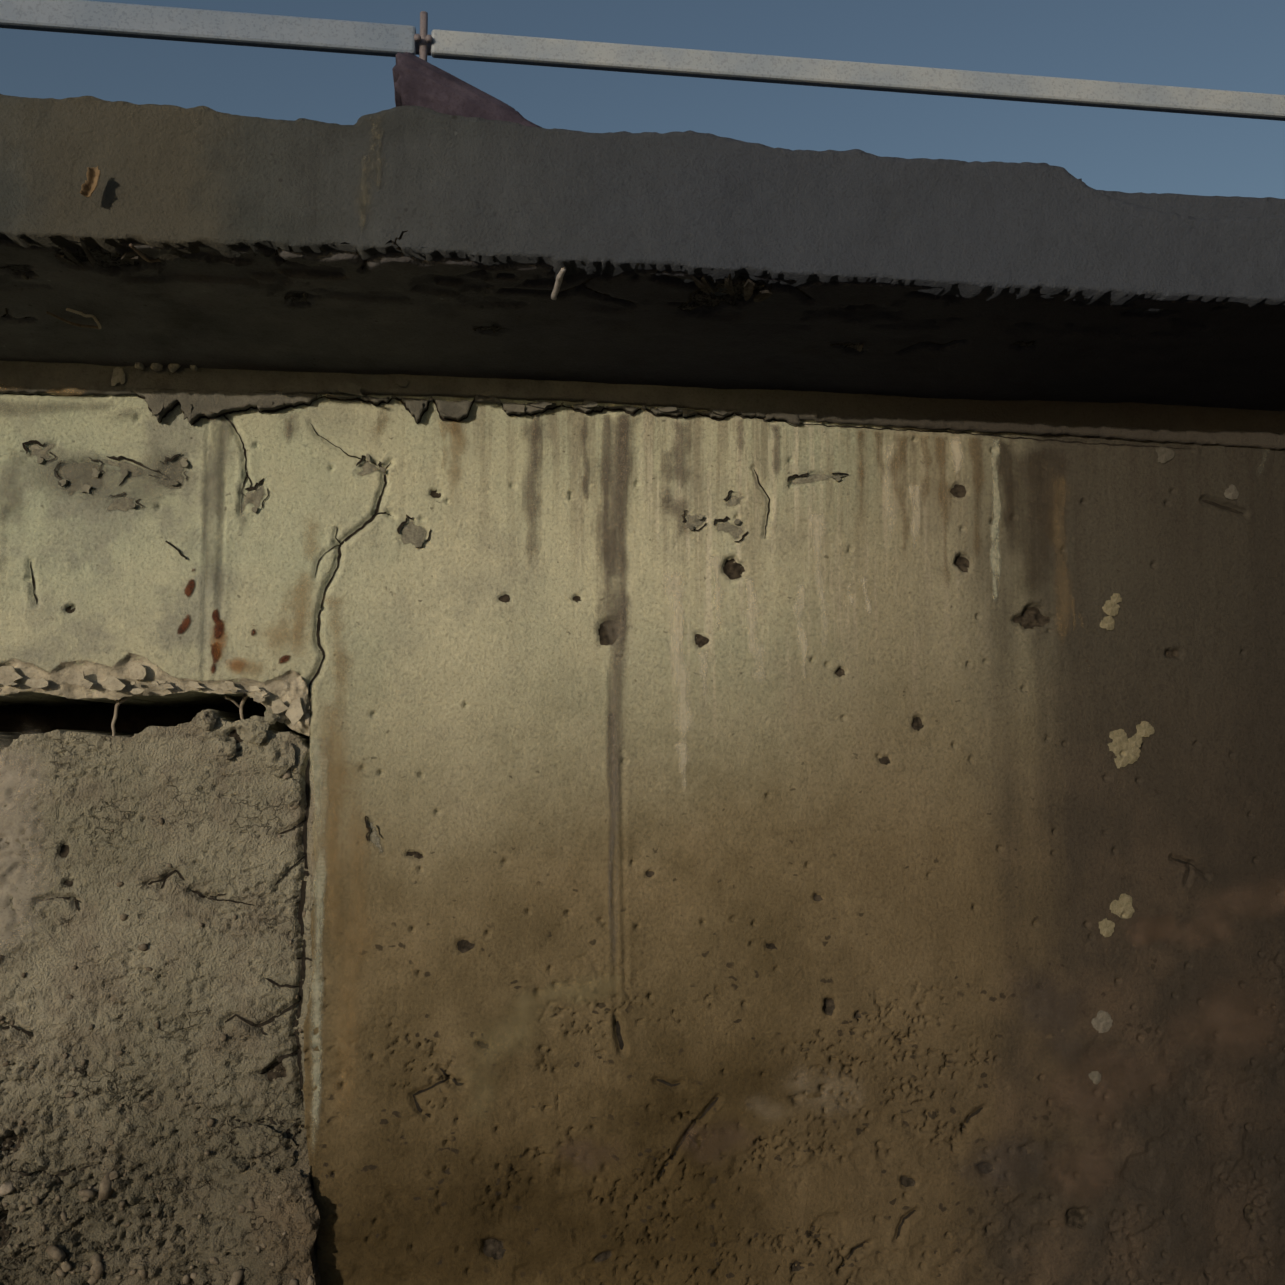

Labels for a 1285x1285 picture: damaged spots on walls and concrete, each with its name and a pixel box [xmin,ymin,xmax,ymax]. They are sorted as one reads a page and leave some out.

peeling [125,379,800,427]
spalling [22,440,189,511]
leakage [525,417,541,550]
leakage [927,439,1064,597]
spalling [0,653,311,736]
corrosion [177,615,190,634]
corrosion [184,569,195,597]
corrosion [211,609,242,673]
crack [308,423,394,717]
leakage [583,415,630,905]
crack [148,758,312,1154]
crack [2,1025,33,1037]